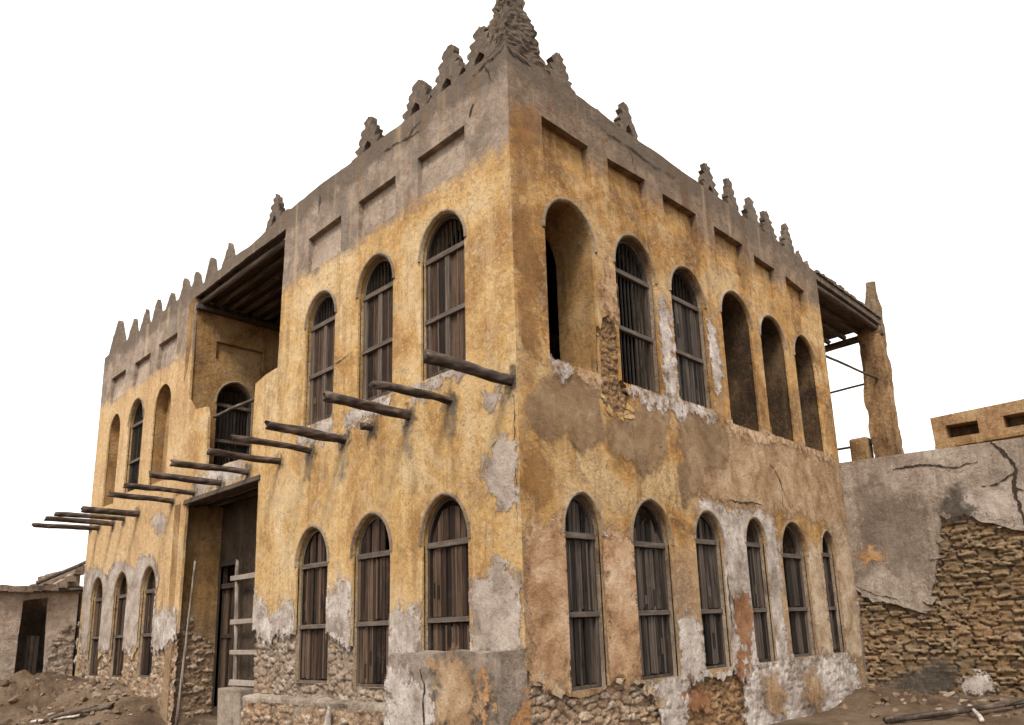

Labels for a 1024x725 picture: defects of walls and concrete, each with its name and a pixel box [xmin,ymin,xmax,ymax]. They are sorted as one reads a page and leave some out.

peeling [476,429,520,514]
water stain [525,374,730,508]
flaking render [547,260,1024,725]
crack [893,442,1024,523]
peeling [45,552,215,725]
flaking render [241,574,436,725]
crack [418,669,426,725]
peeling [468,511,667,725]